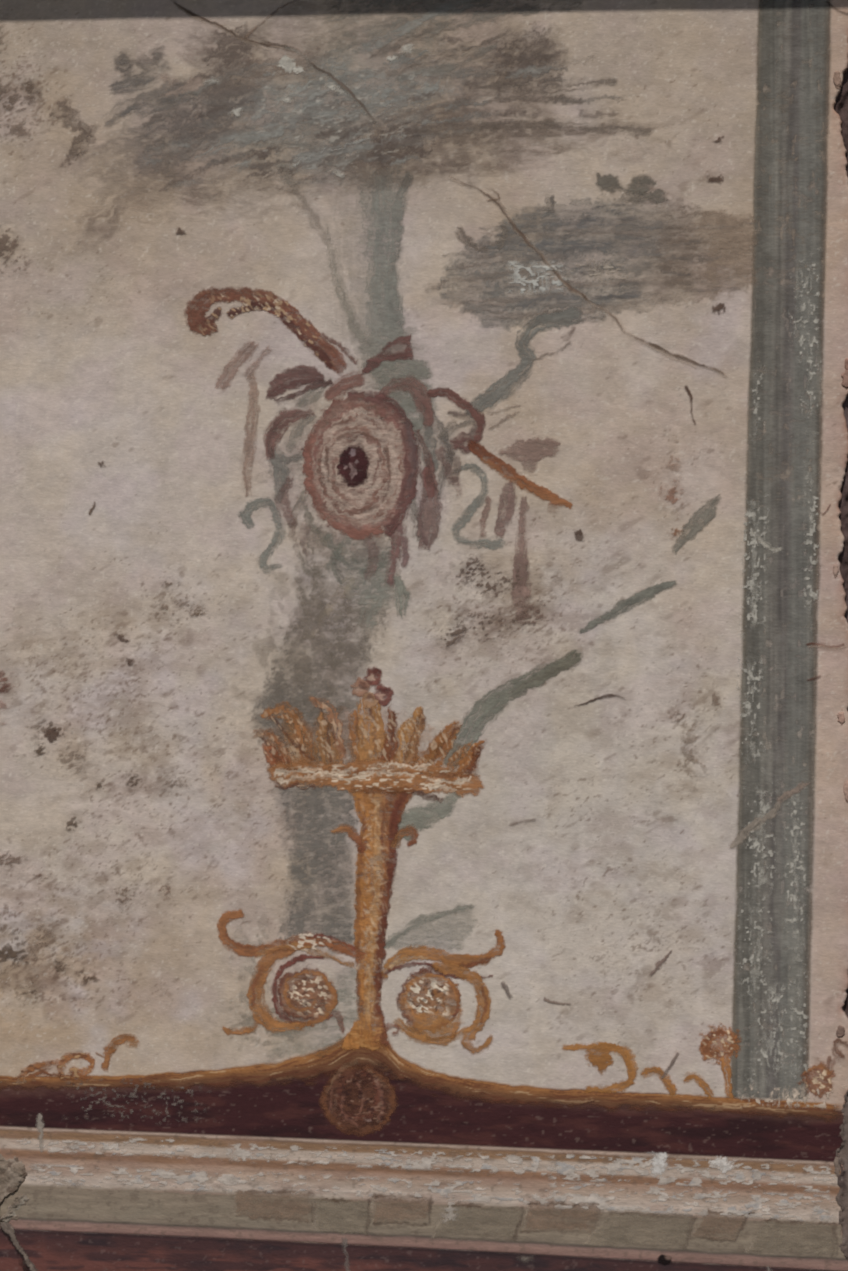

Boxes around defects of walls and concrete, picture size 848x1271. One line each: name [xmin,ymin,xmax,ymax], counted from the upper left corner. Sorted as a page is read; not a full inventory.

crack [175,3,376,123]
spalling [833,70,848,177]
peeling [510,262,622,292]
crack [463,183,726,422]
peeling [791,264,819,410]
peeling [743,504,767,623]
peeling [804,478,818,604]
spalling [833,463,848,622]
spalling [45,728,58,742]
peeling [738,662,762,756]
peeling [17,791,848,1259]
crack [0,1222,37,1271]